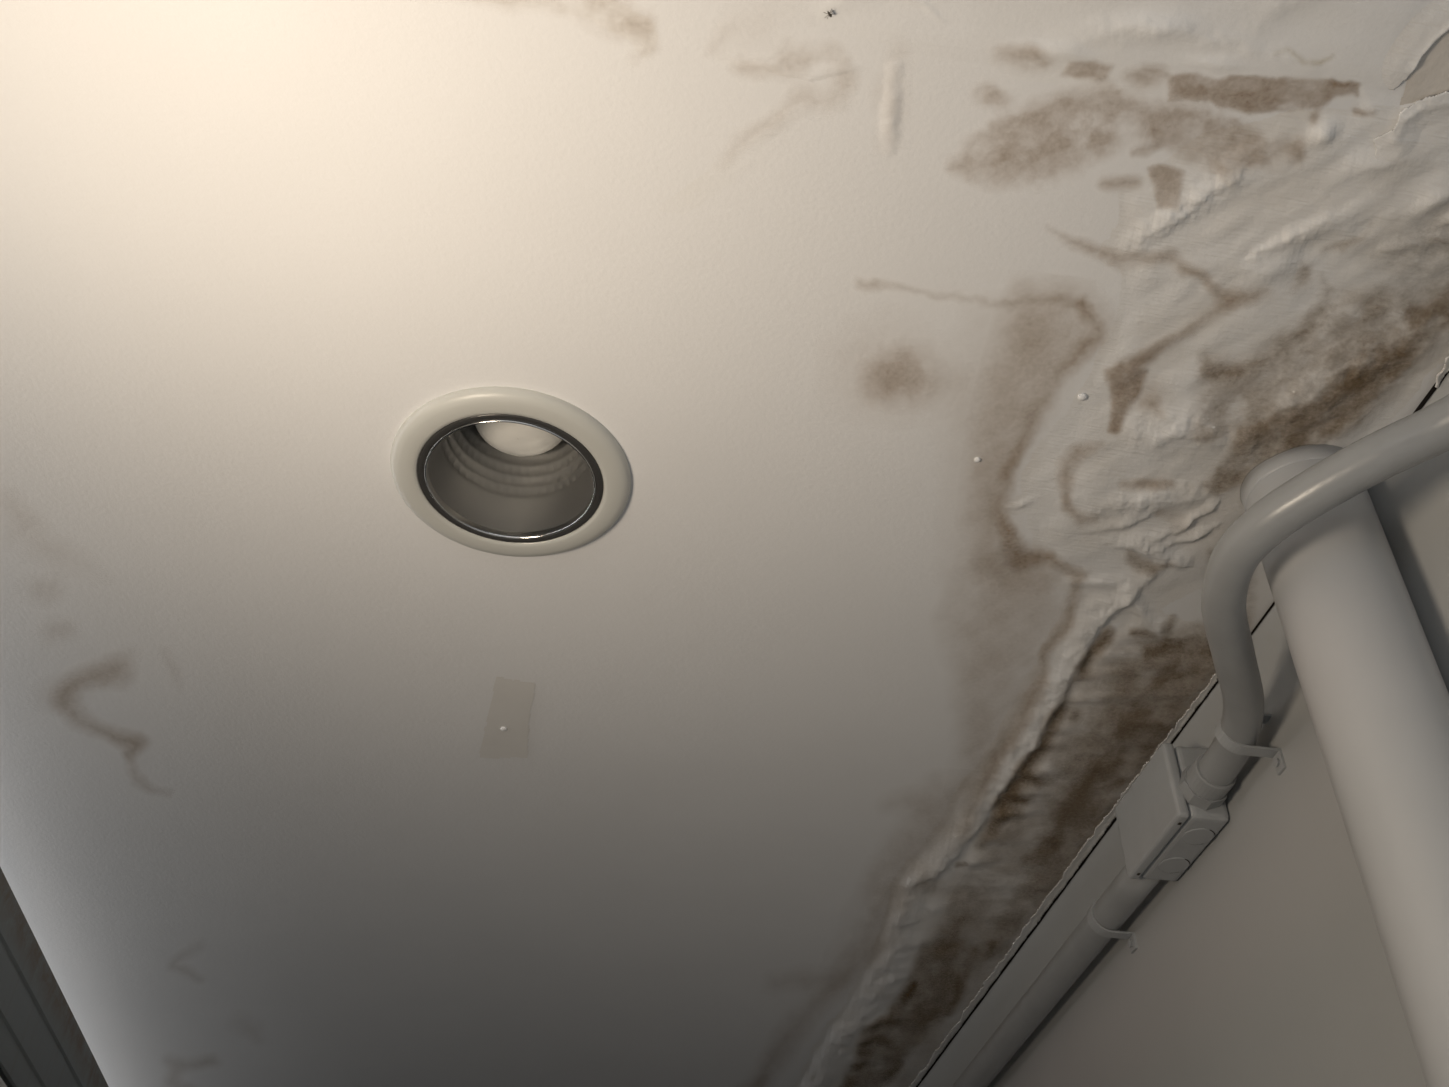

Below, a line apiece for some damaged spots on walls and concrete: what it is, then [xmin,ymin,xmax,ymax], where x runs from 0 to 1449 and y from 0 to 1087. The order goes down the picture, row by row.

peeling [1373,0,1449,162]